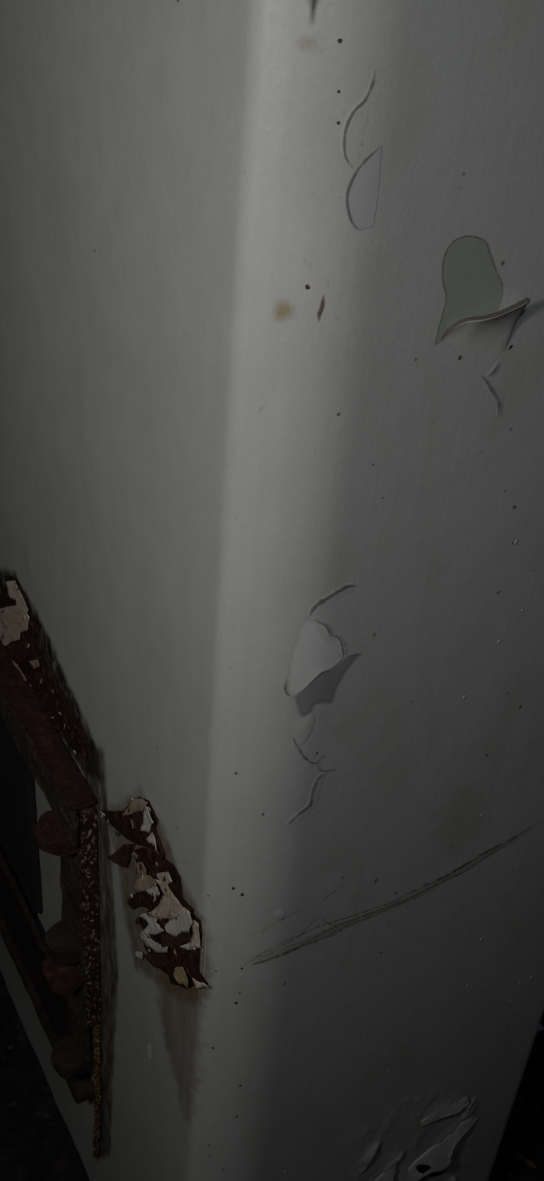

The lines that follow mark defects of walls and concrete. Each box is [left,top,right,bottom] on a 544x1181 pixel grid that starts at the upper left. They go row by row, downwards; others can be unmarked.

peeling [435,235,531,418]
peeling [284,583,360,826]
corrosion [0,571,217,1156]